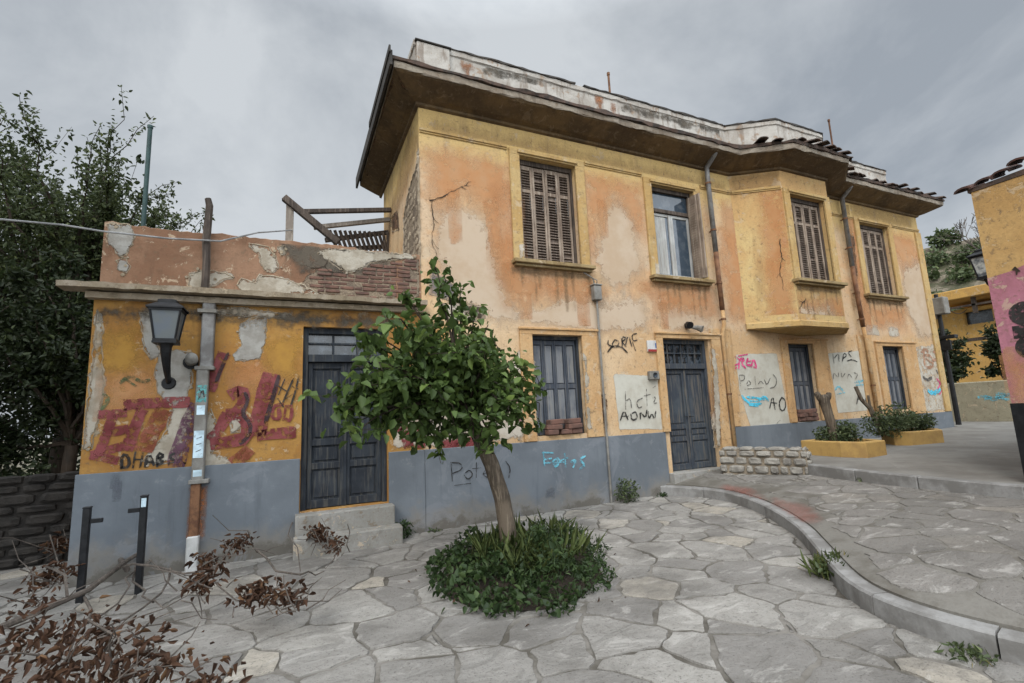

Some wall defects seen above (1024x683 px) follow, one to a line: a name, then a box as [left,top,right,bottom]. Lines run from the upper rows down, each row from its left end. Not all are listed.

crack [406,149,471,255]
flaking render [302,255,485,322]
flaking render [82,310,107,451]